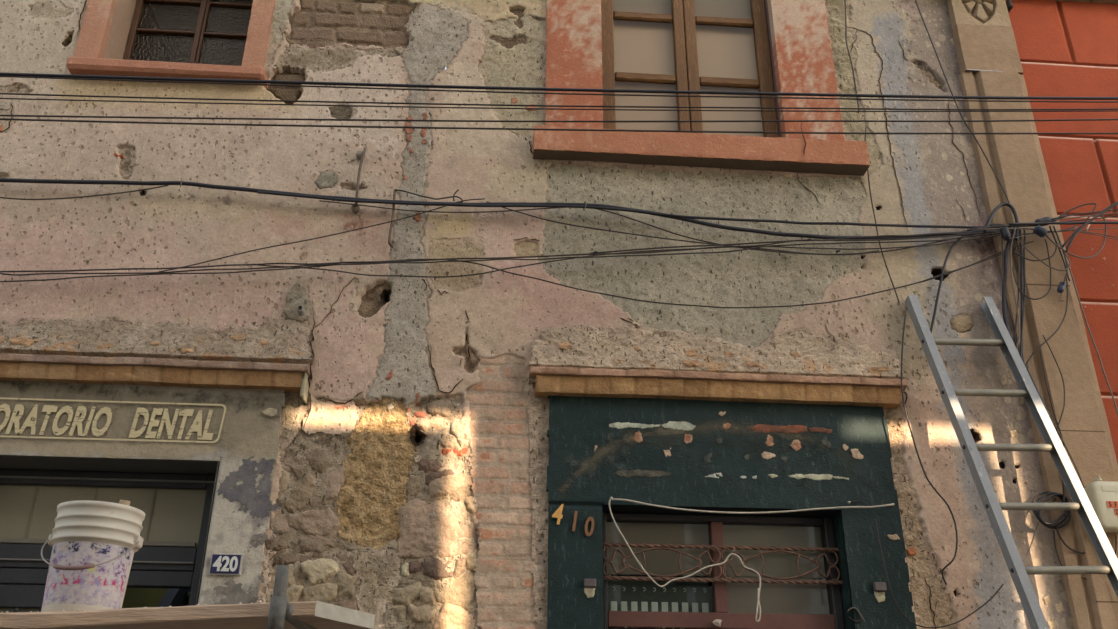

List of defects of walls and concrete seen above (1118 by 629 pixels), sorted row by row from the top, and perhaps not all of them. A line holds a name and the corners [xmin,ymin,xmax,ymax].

flaking render [285,0,416,54]
peeling [404,112,428,153]
crack [850,27,919,232]
crack [945,92,983,219]
flaking render [358,283,392,318]
crack [302,276,363,432]
flaking render [453,340,479,374]
peeling [703,411,731,463]
peeling [744,435,801,463]
flaking render [821,437,864,459]
flaking render [207,392,482,629]